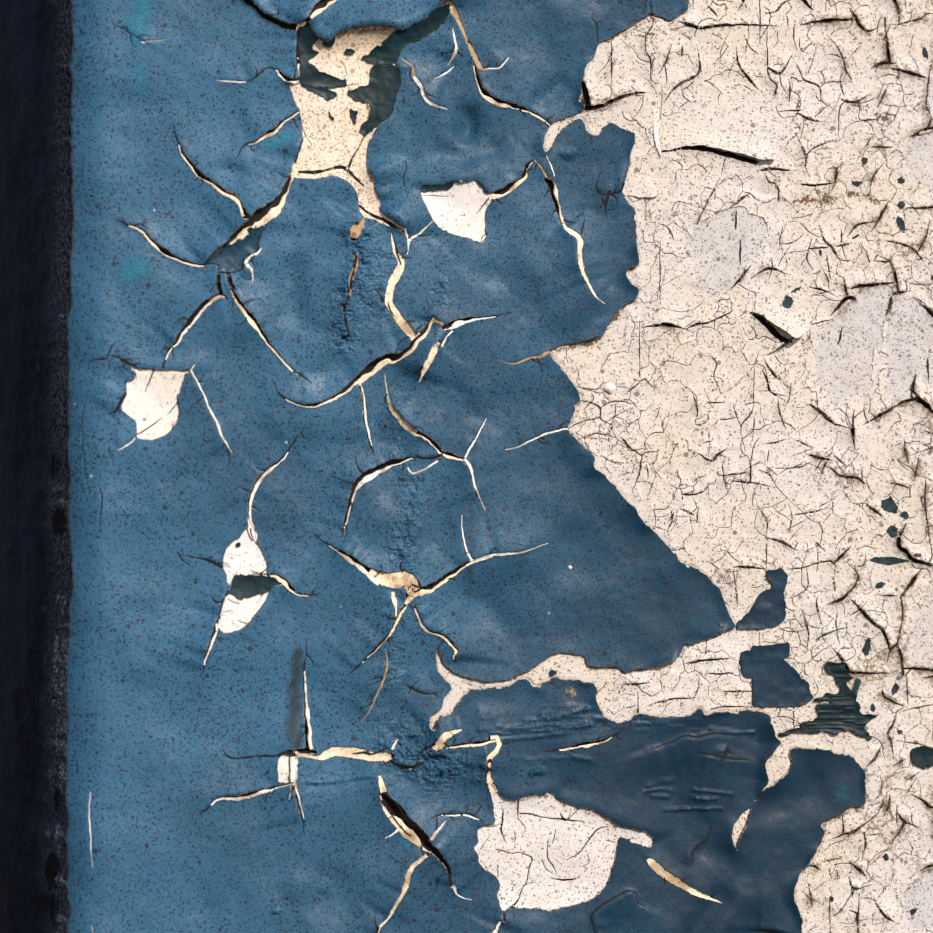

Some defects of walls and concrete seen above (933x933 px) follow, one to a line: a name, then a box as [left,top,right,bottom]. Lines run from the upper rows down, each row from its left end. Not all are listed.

crack [215,0,336,84]
peeling [289,1,453,234]
crack [401,0,554,126]
crack [90,343,139,417]
peeling [122,367,190,440]
crack [116,110,548,722]
peeling [419,0,933,933]
crack [489,0,933,933]
peeling [216,518,282,633]
crack [86,792,94,867]
peeling [278,750,297,785]
crack [199,639,510,933]